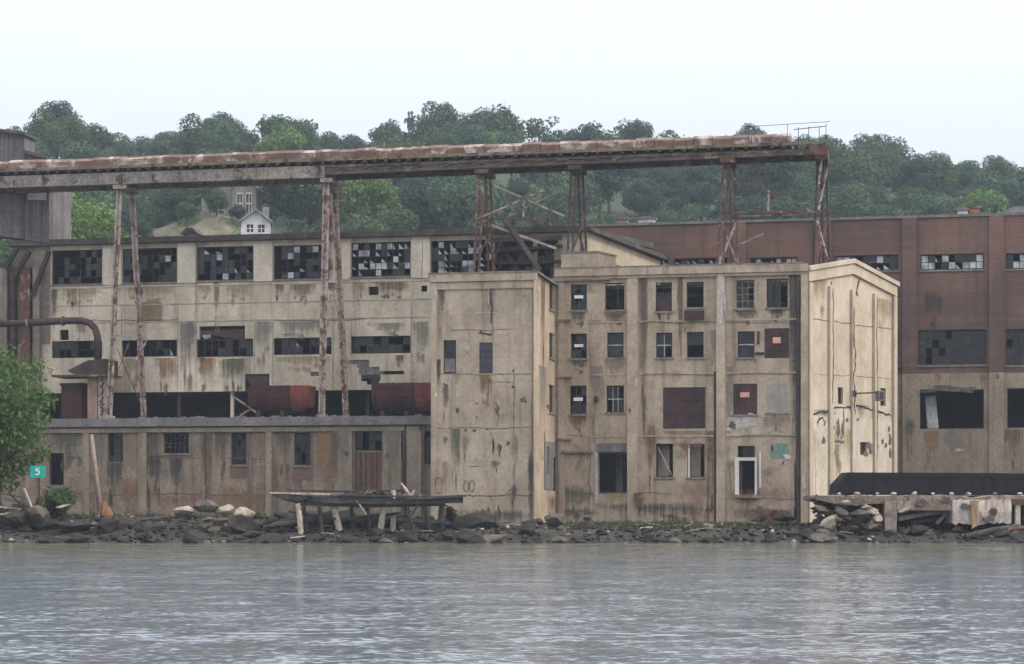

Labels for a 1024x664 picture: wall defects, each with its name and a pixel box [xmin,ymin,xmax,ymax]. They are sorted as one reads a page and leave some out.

crack [813,405,891,416]
damp [93,427,122,505]
damp [141,427,182,501]
damp [202,432,226,479]
peeling [802,406,892,519]
damp [607,494,694,521]